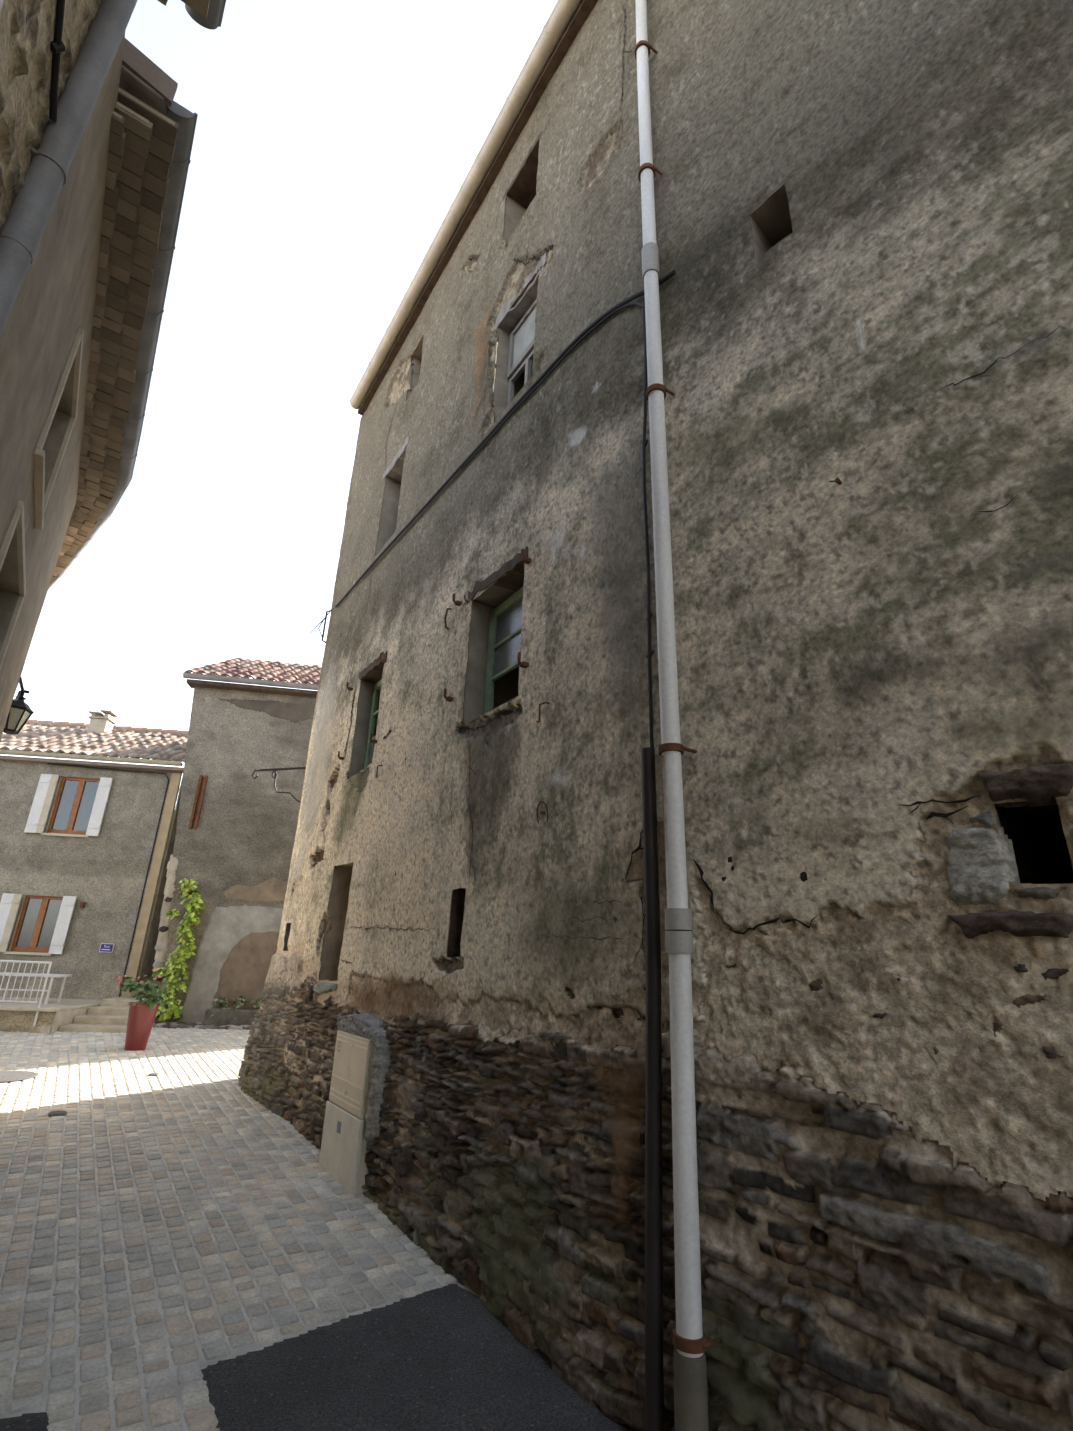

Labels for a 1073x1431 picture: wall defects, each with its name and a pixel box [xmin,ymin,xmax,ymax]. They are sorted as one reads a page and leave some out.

crack [693,859,819,935]
flaking render [434,957,464,974]
flaking render [347,973,666,1050]
flaking render [693,746,1073,1201]